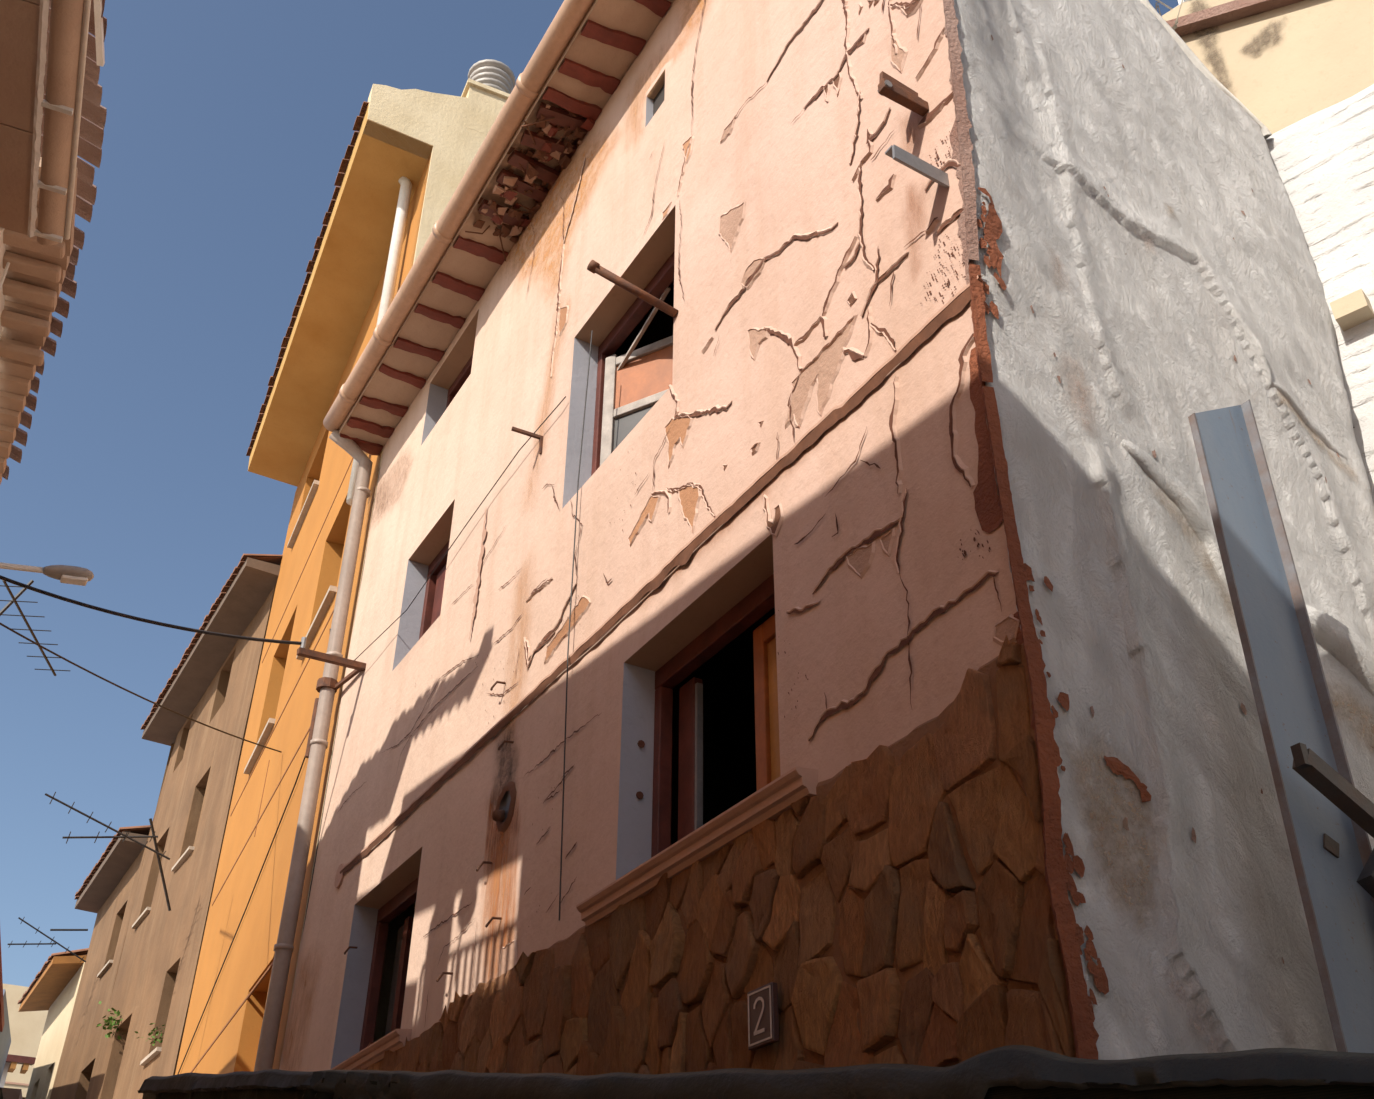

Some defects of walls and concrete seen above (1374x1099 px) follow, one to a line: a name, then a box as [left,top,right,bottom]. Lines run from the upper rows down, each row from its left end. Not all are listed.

crack [644,0,705,299]
peeling [890,38,908,74]
spalling [900,0,923,18]
crack [384,484,611,769]
crack [525,158,586,377]
corrosion [340,287,971,875]
crack [635,384,731,516]
crack [701,0,1002,741]
flaking render [920,0,1109,1060]
corrosion [486,798,516,981]
crack [524,714,599,911]
spalling [1104,756,1151,802]